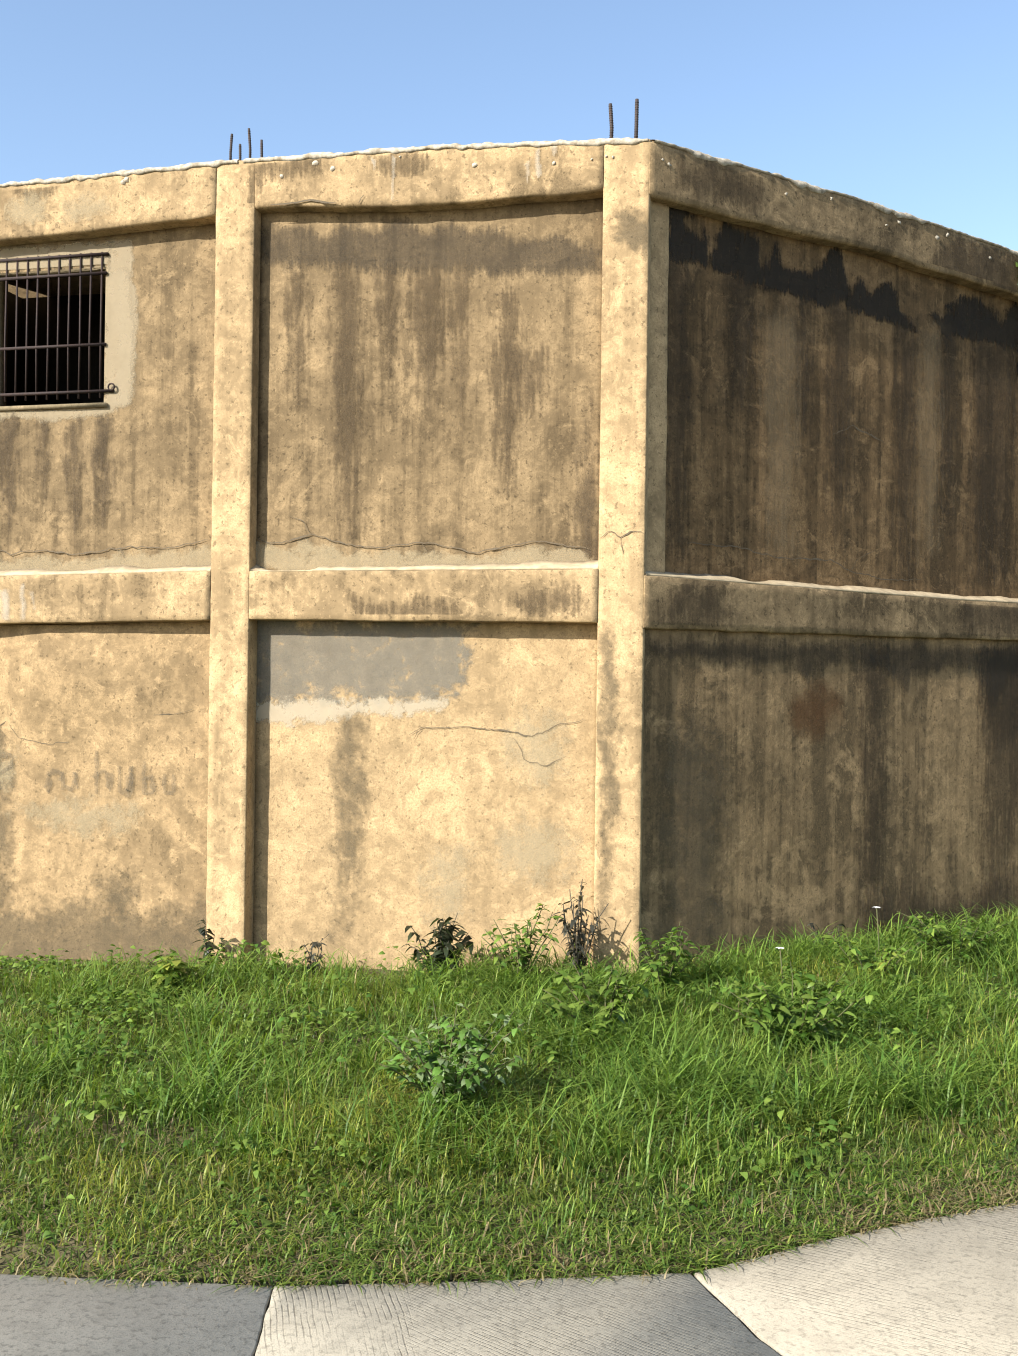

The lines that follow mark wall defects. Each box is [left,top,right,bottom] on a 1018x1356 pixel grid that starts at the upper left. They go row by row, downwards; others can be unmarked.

water stain [261,223,595,275]
water stain [669,207,917,333]
water stain [933,294,1018,375]
water stain [654,642,1018,696]
water stain [256,697,448,727]